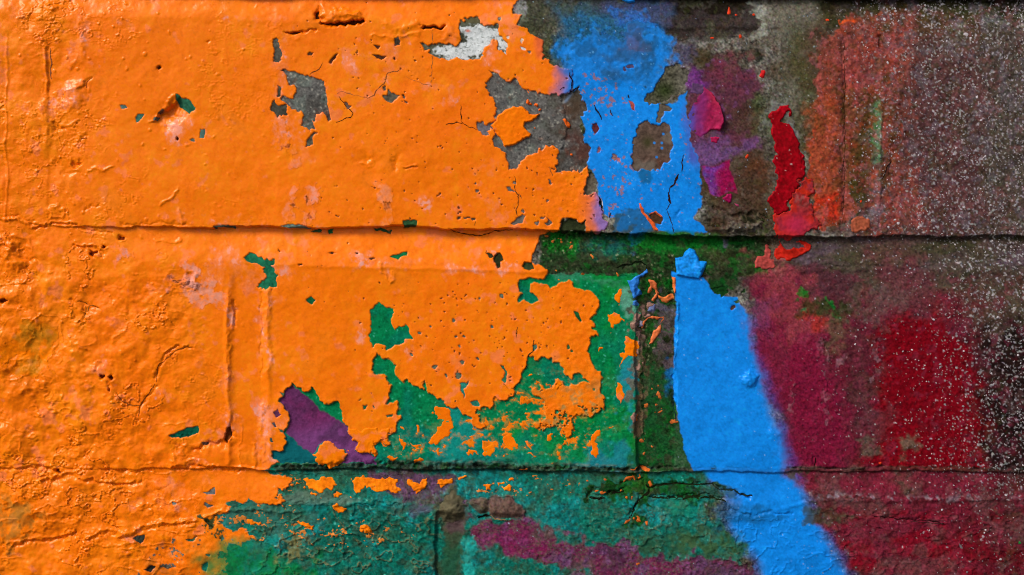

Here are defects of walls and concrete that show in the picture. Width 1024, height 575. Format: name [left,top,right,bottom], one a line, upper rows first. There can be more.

spalling [316,12,364,26]
peeling [421,17,531,60]
spalling [176,94,195,114]
peeling [271,38,353,146]
peeling [383,86,407,103]
peeling [477,72,601,195]
peeling [612,64,724,171]
crack [666,155,684,232]
peeling [512,210,585,249]
peeling [639,203,663,231]
peeling [199,248,707,548]
crack [589,482,752,518]